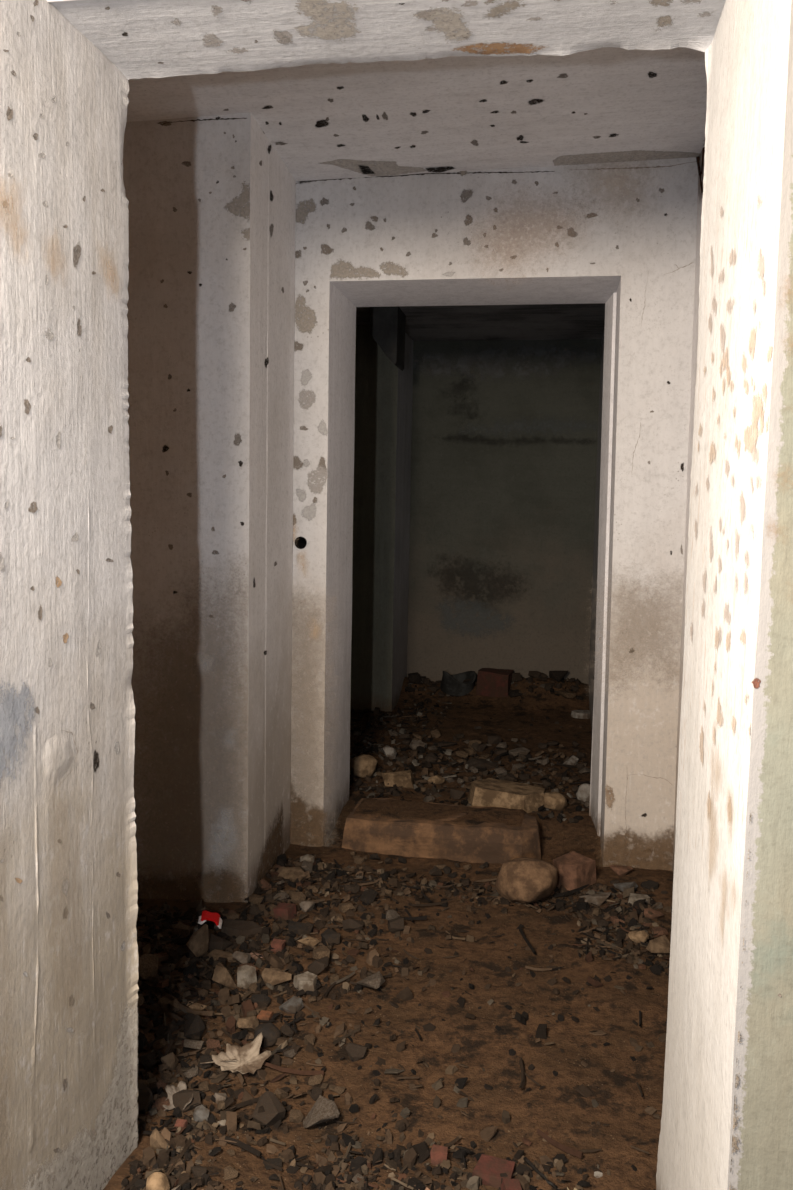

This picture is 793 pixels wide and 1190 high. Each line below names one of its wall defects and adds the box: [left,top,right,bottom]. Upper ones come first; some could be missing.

rust [453,43,545,55]